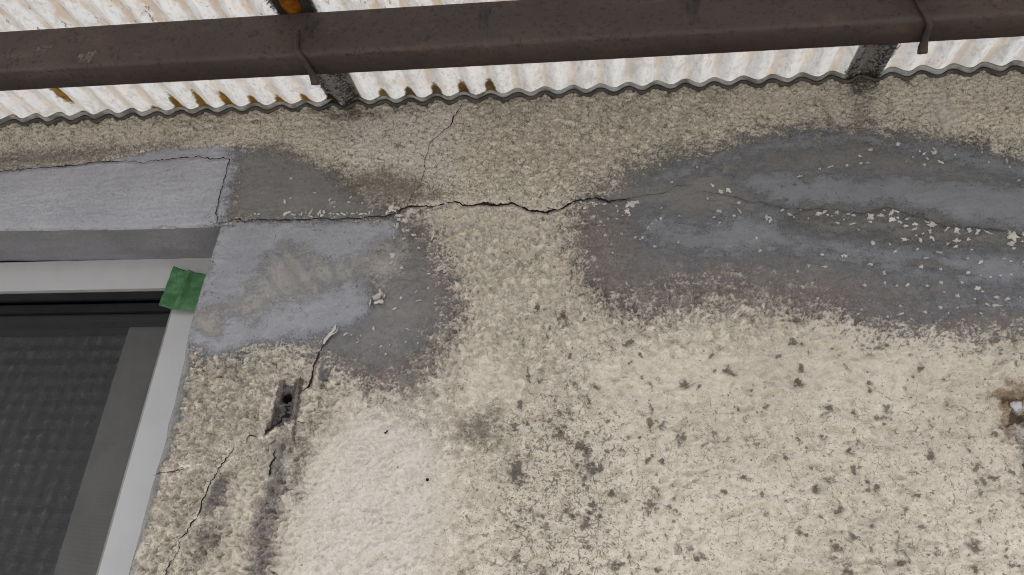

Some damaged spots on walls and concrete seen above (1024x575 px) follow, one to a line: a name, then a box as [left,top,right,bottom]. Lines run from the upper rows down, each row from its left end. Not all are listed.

damp [329,165,459,208]
crack [0,104,1020,235]
hole [263,377,308,444]
crack [303,338,329,391]
damp [301,221,464,402]
damp [573,200,1023,387]
crack [155,435,276,575]